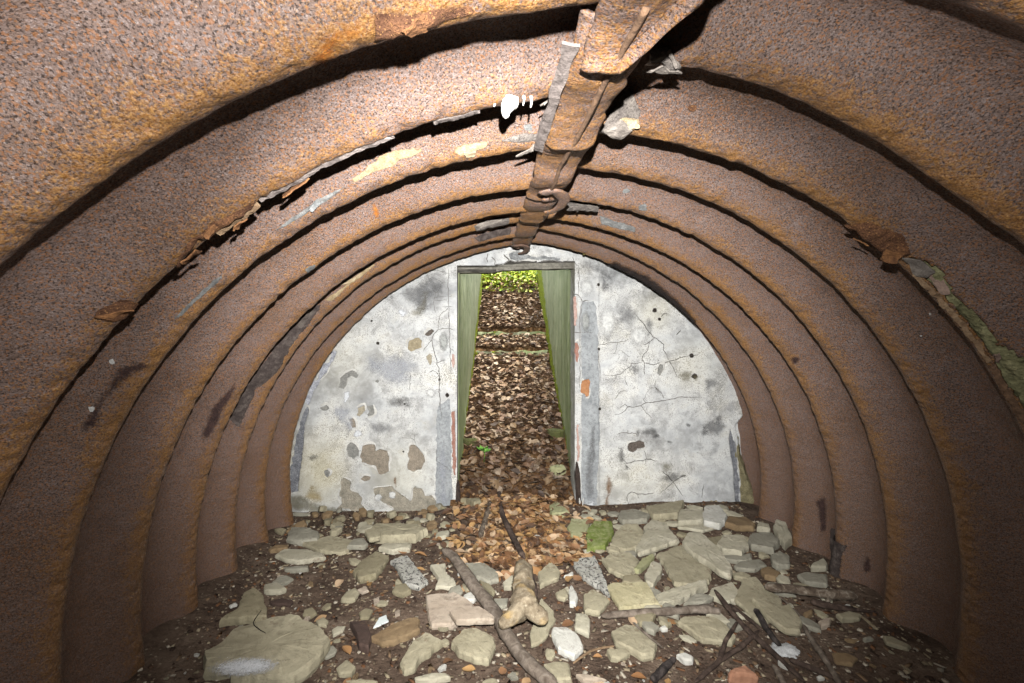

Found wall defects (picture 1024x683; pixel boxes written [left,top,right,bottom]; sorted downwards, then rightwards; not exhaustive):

rust [374,6,474,41]
peeling [600,88,640,140]
peeling [216,135,395,236]
rust [176,201,256,268]
rust [844,222,911,264]
rust [94,299,139,322]
peeling [902,258,992,363]
spalling [406,327,435,365]
crack [486,254,704,504]
spalling [324,393,457,511]